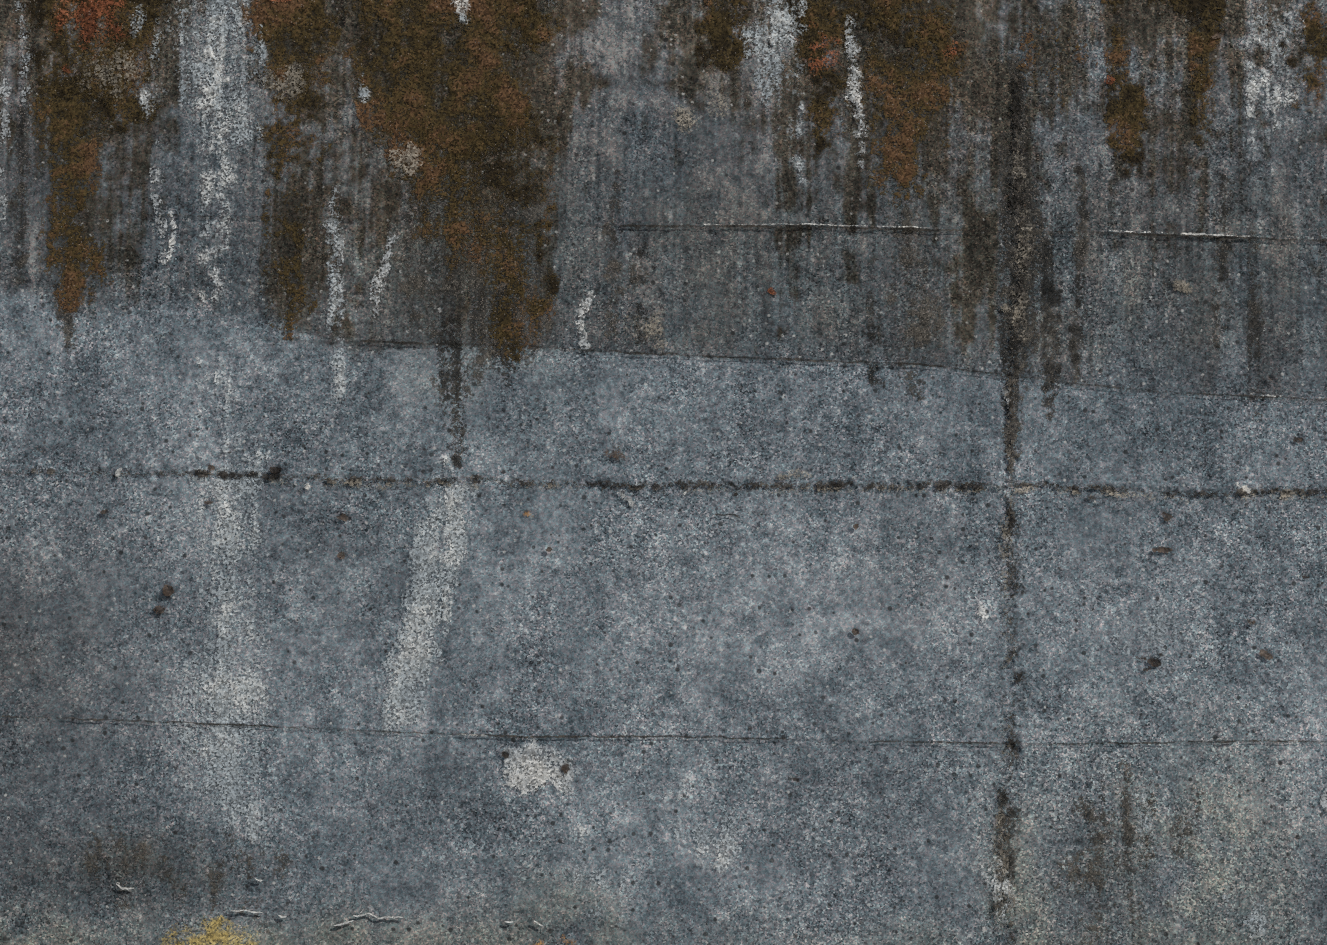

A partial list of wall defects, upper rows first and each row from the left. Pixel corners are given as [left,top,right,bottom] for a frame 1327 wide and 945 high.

water stain [0,3,32,271]
rust [19,0,170,313]
water stain [150,168,176,262]
efflorescence [179,0,267,302]
water stain [323,191,344,325]
rust [239,0,568,363]
rust [693,0,762,73]
efflorescence [743,0,805,102]
efflorescence [845,18,865,168]
rust [785,0,970,207]
water stain [997,53,1090,458]
efflorescence [1246,13,1296,149]